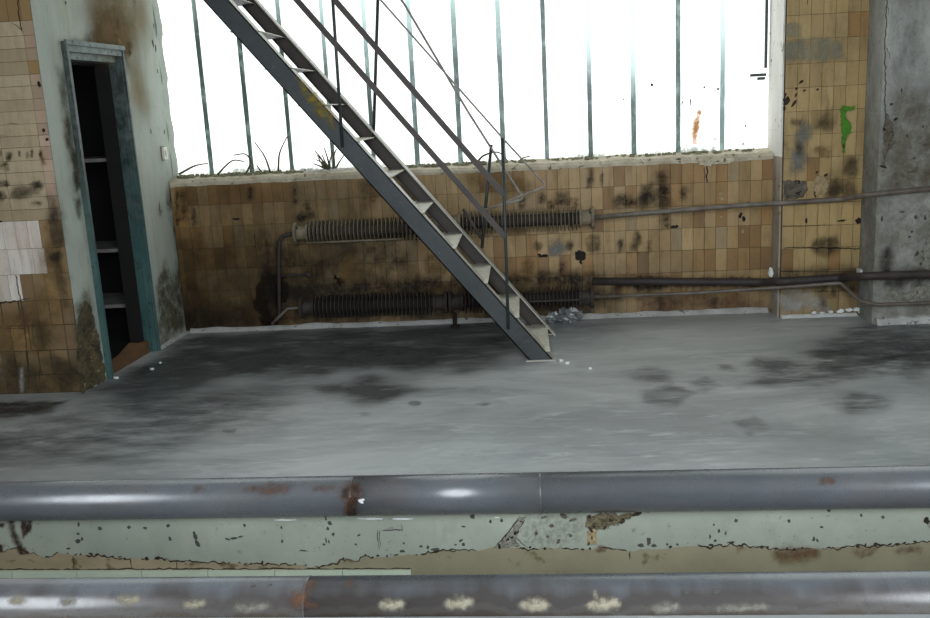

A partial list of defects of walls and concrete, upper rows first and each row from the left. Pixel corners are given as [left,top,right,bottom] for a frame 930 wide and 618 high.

water stain [99,271,509,402]
water stain [756,324,930,384]
corrosion [344,484,358,516]
spalling [0,508,930,575]